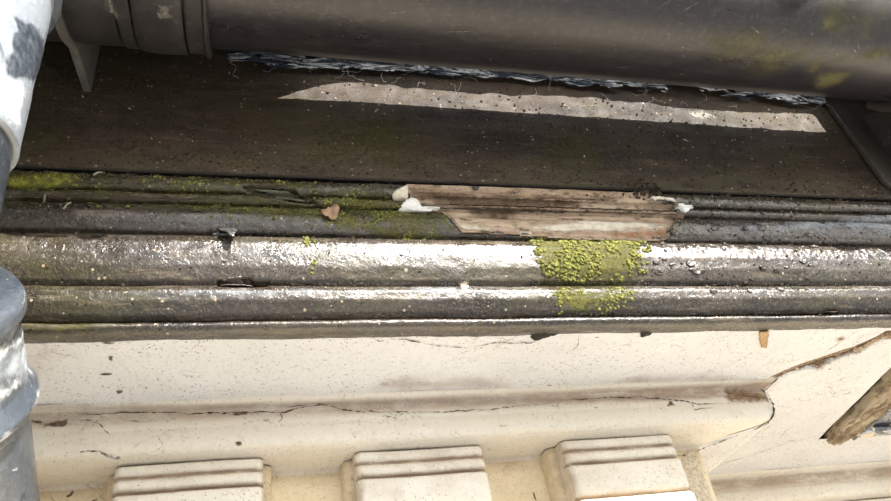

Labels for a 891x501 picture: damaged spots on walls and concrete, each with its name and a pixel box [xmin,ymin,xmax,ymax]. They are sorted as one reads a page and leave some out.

peeling [393,184,719,294]
crack [771,331,891,378]
crack [59,396,723,435]